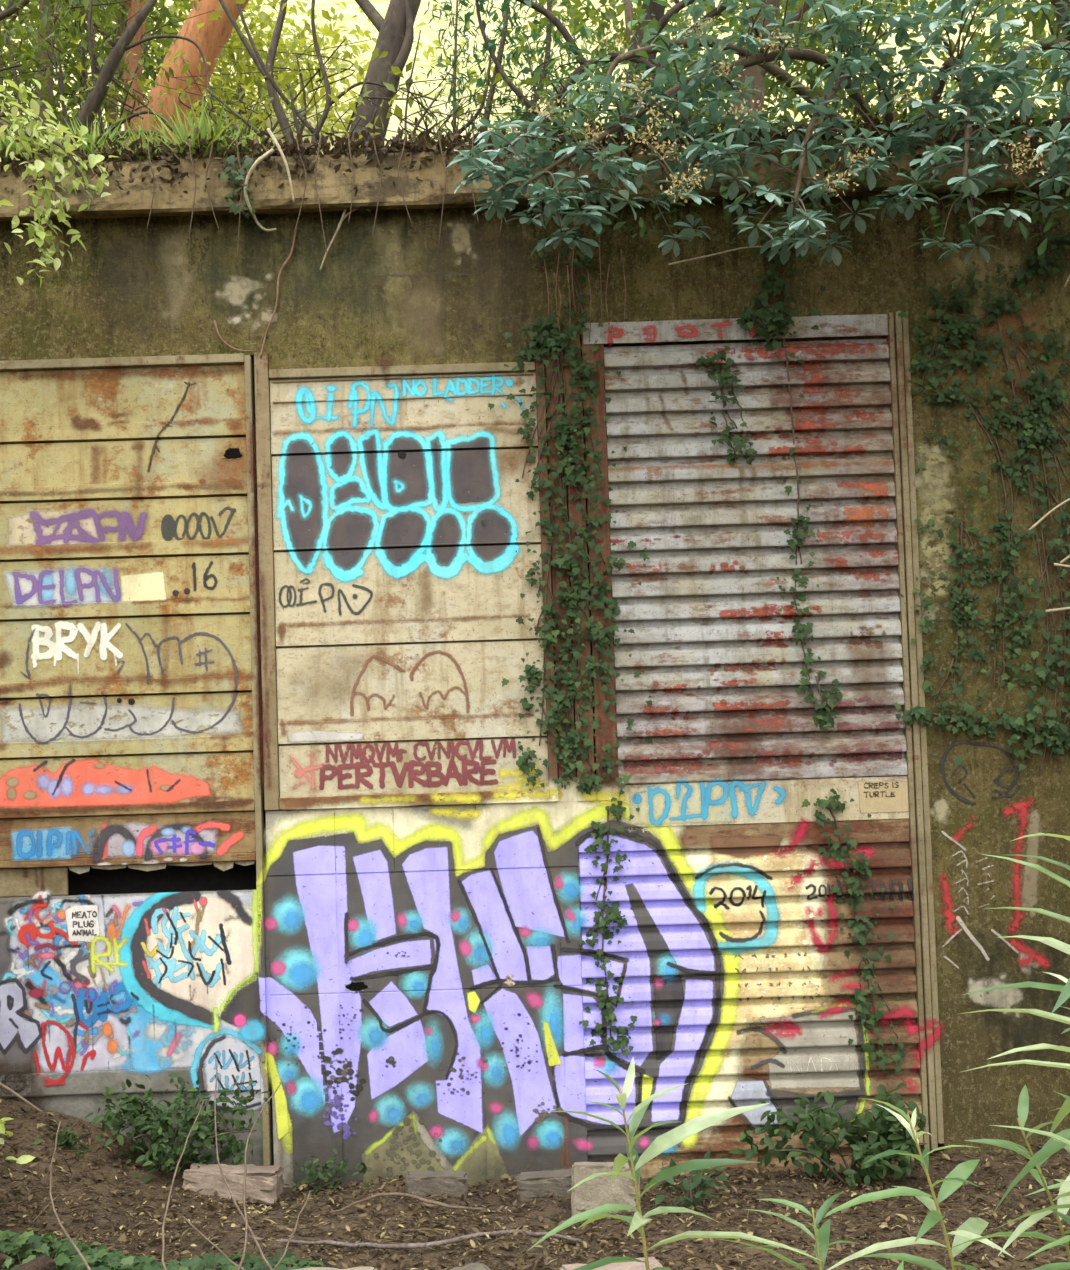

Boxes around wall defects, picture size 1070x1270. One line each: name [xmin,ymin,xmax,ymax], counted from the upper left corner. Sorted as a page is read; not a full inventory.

spalling [216,273,278,331]
peeling [603,339,892,460]
spalling [62,381,267,896]
corrosion [0,416,530,809]
peeling [709,560,747,574]
peeling [808,481,903,581]
peeling [841,625,885,649]
corrosion [0,805,130,814]
peeling [614,603,821,785]
peeling [823,698,904,734]
peeling [820,748,919,779]
corrosion [863,852,912,1055]